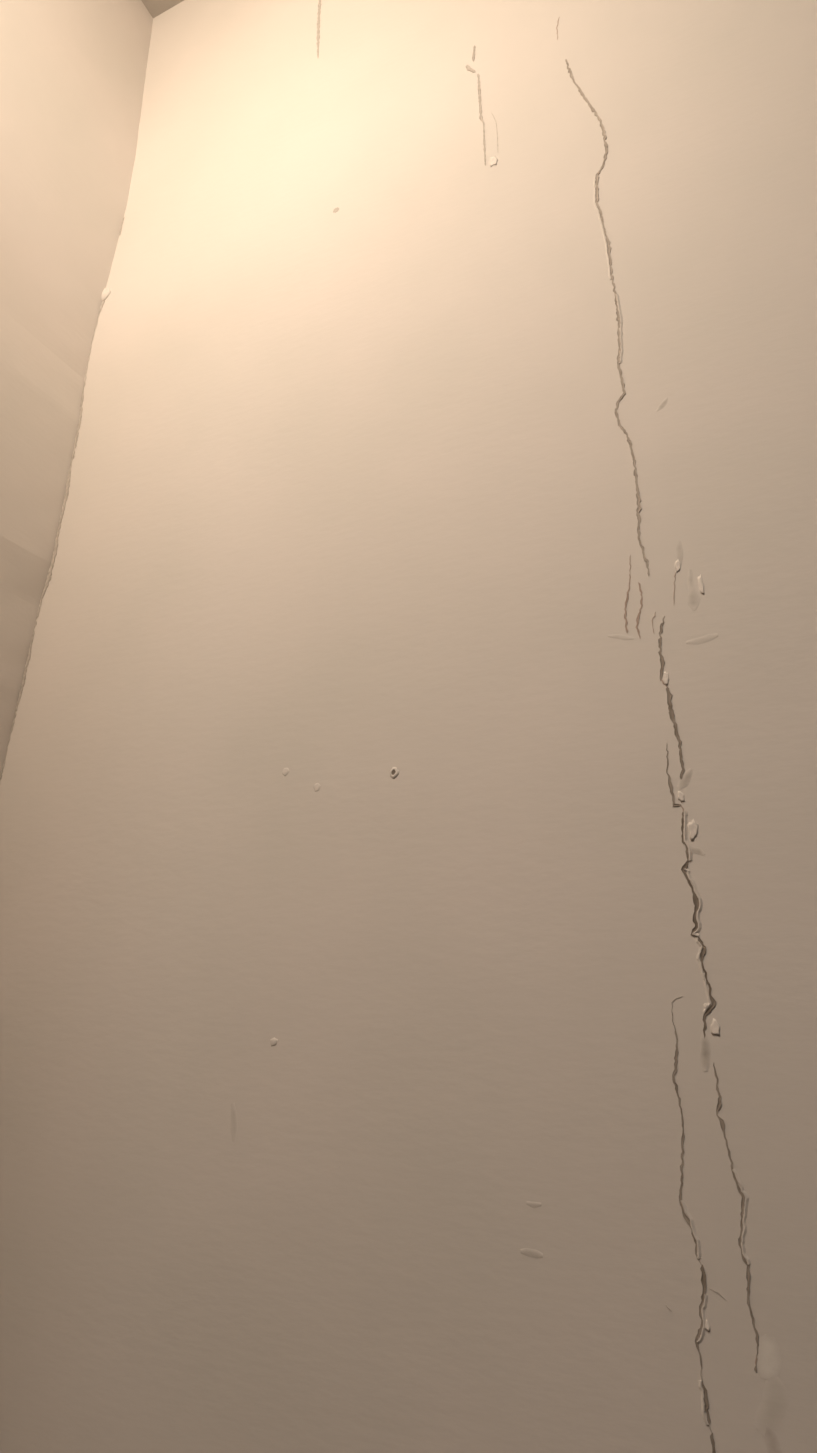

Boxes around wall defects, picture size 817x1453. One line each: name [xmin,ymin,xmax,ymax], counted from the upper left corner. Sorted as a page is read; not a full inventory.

crack [556,17,759,1453]